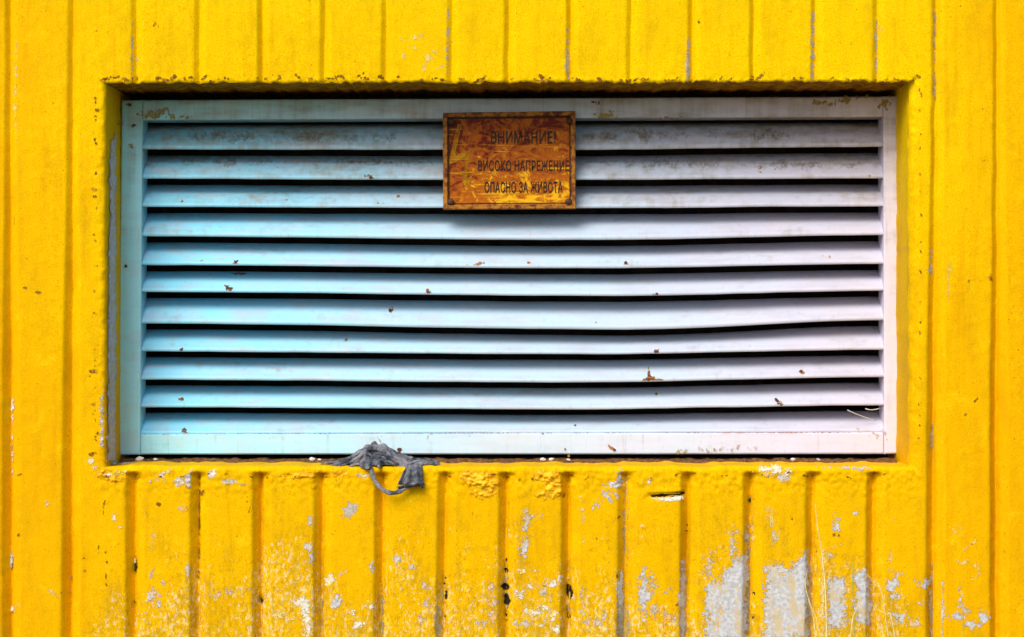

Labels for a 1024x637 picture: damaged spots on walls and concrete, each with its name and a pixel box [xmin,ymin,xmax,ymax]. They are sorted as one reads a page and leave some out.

corrosion [126,103,192,128]
peeling [87,134,253,496]
peeling [578,468,629,522]
peeling [511,509,688,637]
peeling [702,511,991,637]